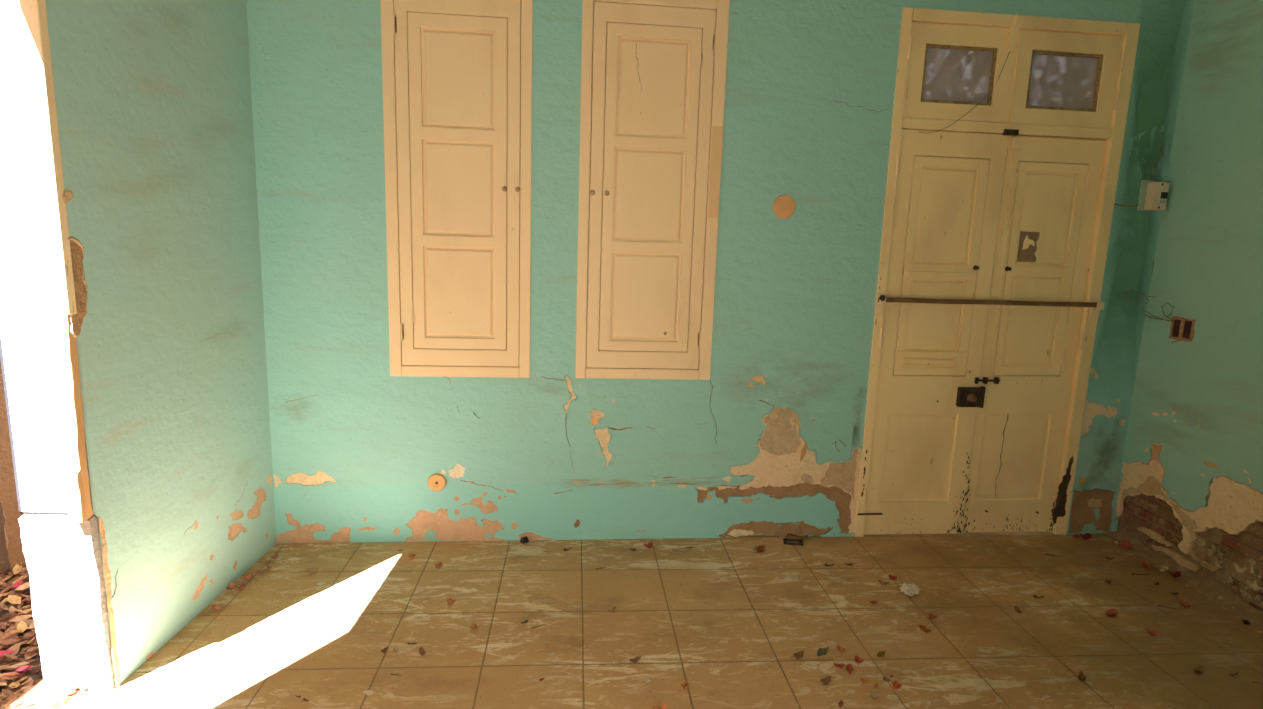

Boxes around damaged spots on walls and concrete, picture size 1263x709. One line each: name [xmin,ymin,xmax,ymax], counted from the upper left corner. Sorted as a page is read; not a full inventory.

spalling [65,237,88,337]
peeling [563,375,581,415]
peeling [588,395,615,468]
spalling [678,375,867,538]
spalling [1081,399,1125,439]
spalling [216,471,338,542]
peeling [265,513,377,543]
peeling [393,464,552,542]
flaking render [1113,442,1263,611]
peeling [192,575,214,600]